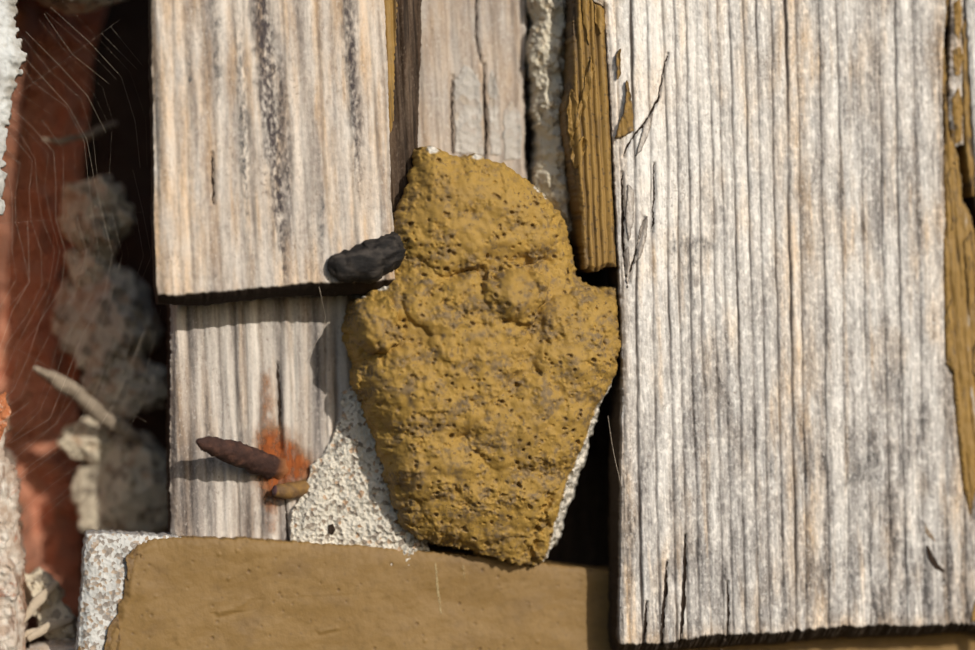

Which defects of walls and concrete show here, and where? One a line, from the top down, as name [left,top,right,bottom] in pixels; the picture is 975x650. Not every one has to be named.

peeling [582,0,606,44]
peeling [566,56,595,169]
crack [621,56,668,277]
peeling [942,0,975,516]
spalling [0,391,11,440]
rust [257,376,311,510]
peeling [125,549,143,580]
peeling [104,614,121,650]